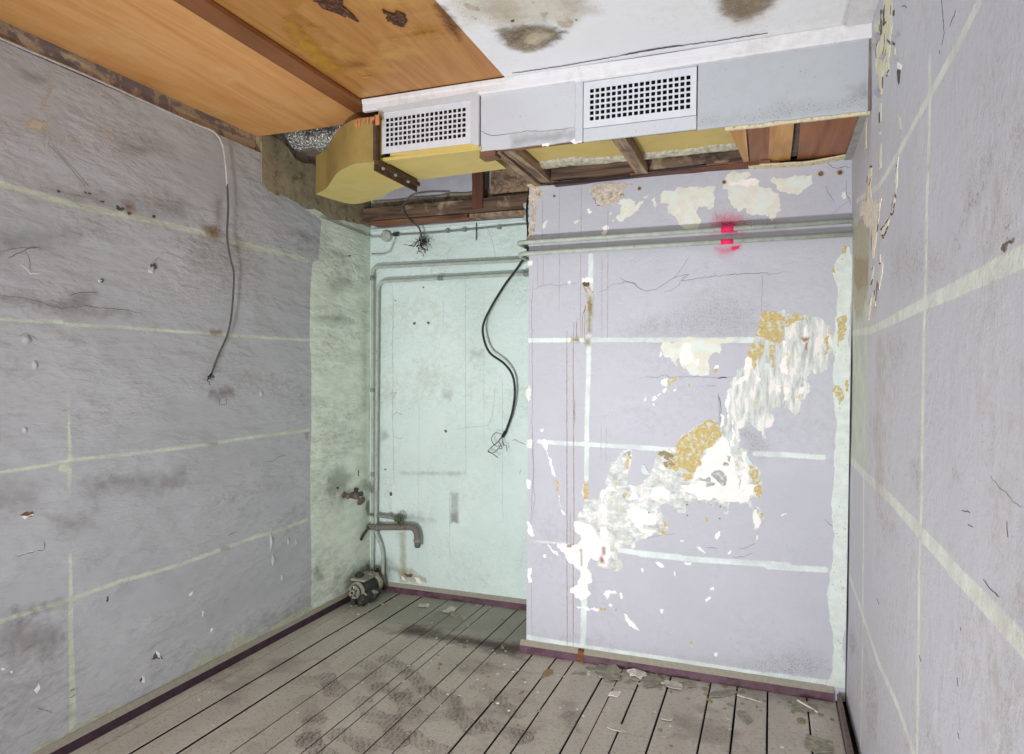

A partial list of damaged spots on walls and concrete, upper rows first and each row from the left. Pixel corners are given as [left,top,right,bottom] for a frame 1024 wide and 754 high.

water stain [499,1,577,51]
water stain [722,0,771,18]
peeling [860,0,902,320]
peeling [527,187,548,240]
peeling [574,170,813,235]
crack [0,246,141,314]
peeling [526,246,852,690]